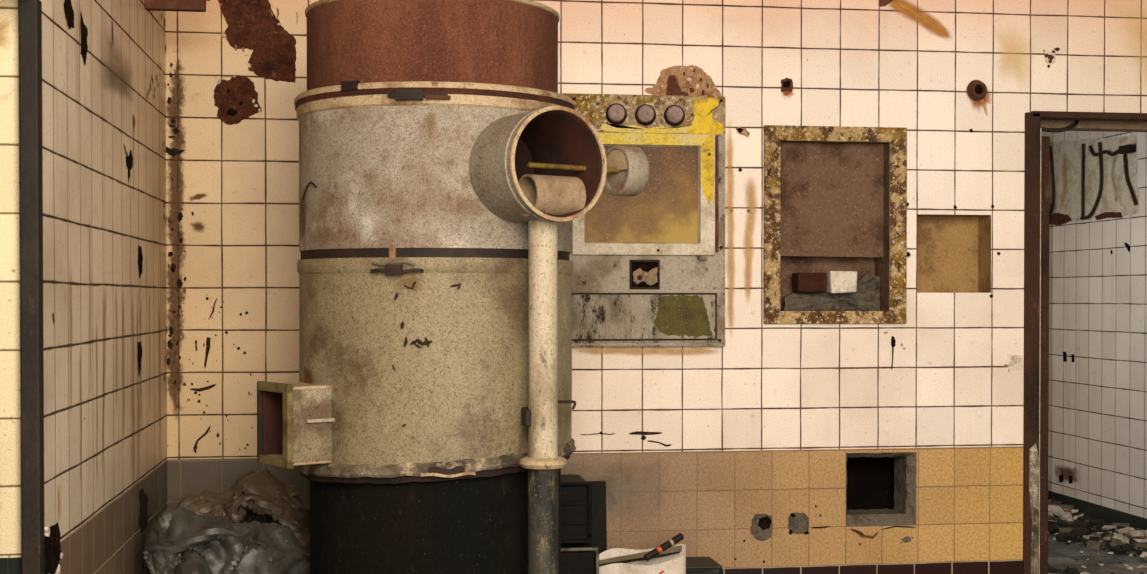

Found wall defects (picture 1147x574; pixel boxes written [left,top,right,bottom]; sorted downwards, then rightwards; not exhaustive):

spalling [213,0,296,125]
spalling [645,65,721,96]
corrosion [972,93,989,115]
spalling [124,145,133,182]
spalling [44,492,64,574]
spalling [750,514,773,541]
spalling [788,512,809,535]